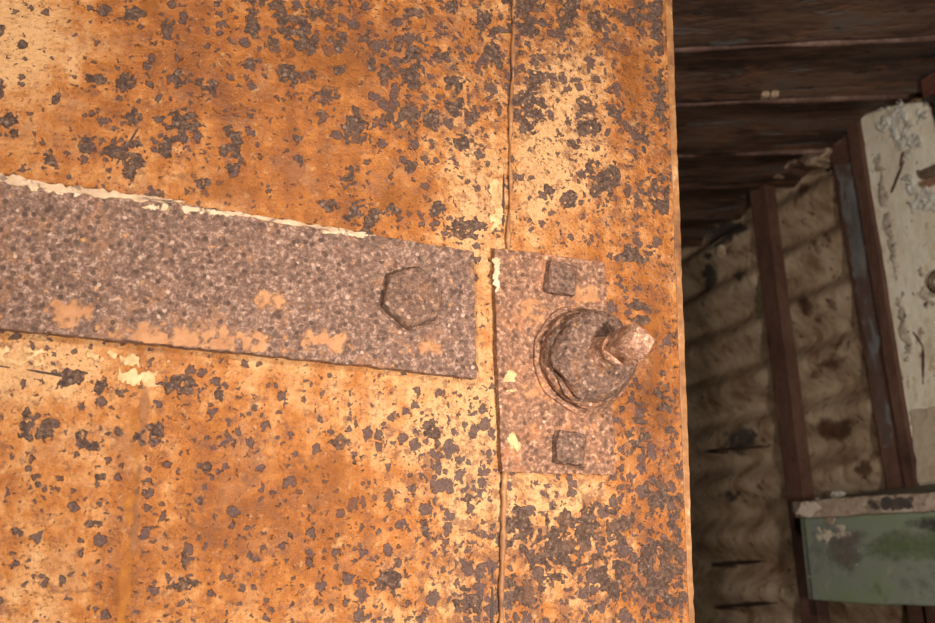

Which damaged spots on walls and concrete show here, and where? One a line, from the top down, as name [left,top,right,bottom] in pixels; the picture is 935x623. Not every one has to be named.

corrosion [85,61,220,162]
corrosion [241,0,480,137]
corrosion [474,0,546,75]
corrosion [507,70,548,135]
corrosion [557,0,667,154]
corrosion [78,134,146,182]
corrosion [544,95,626,213]
corrosion [319,199,403,235]
corrosion [428,199,504,240]
corrosion [51,367,88,387]
corrosion [75,378,164,453]
corrosion [497,480,684,620]